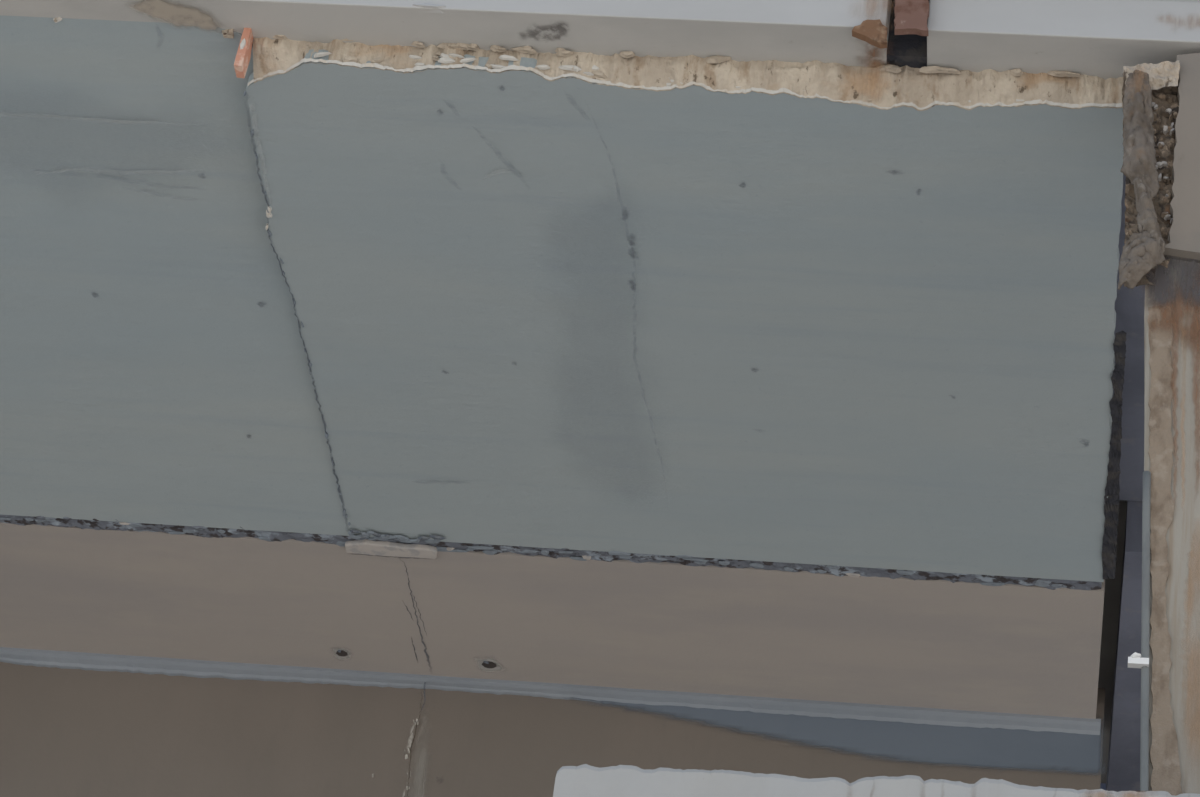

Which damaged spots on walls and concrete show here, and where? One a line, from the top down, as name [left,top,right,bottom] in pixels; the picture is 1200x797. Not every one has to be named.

spalling [222,28,1180,290]
crack [0,129,1102,797]
spalling [1102,331,1126,579]